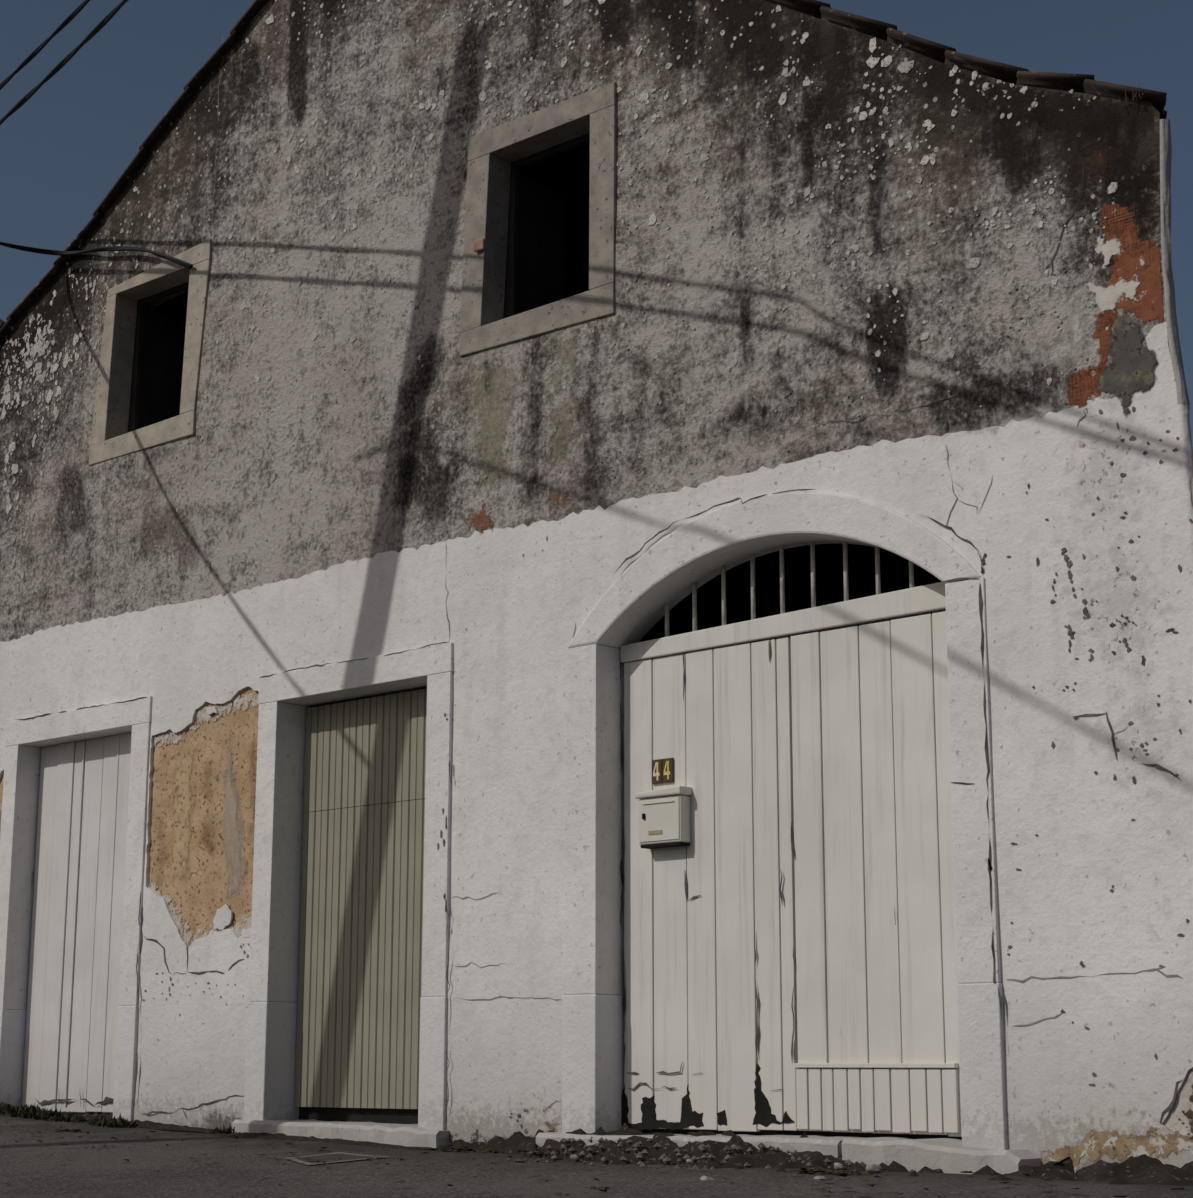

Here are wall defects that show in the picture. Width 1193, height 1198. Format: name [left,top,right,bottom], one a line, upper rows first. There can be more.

damp [288,0,308,124]
damp [601,0,784,87]
damp [926,62,1155,234]
damp [0,254,83,386]
damp [854,280,921,397]
flaking render [1045,203,1164,414]
peeling [1117,422,1179,464]
crack [595,489,817,596]
crack [919,444,1182,1050]
flaking render [148,687,259,958]
crack [136,903,251,1014]
flaking render [1041,1069,1193,1173]